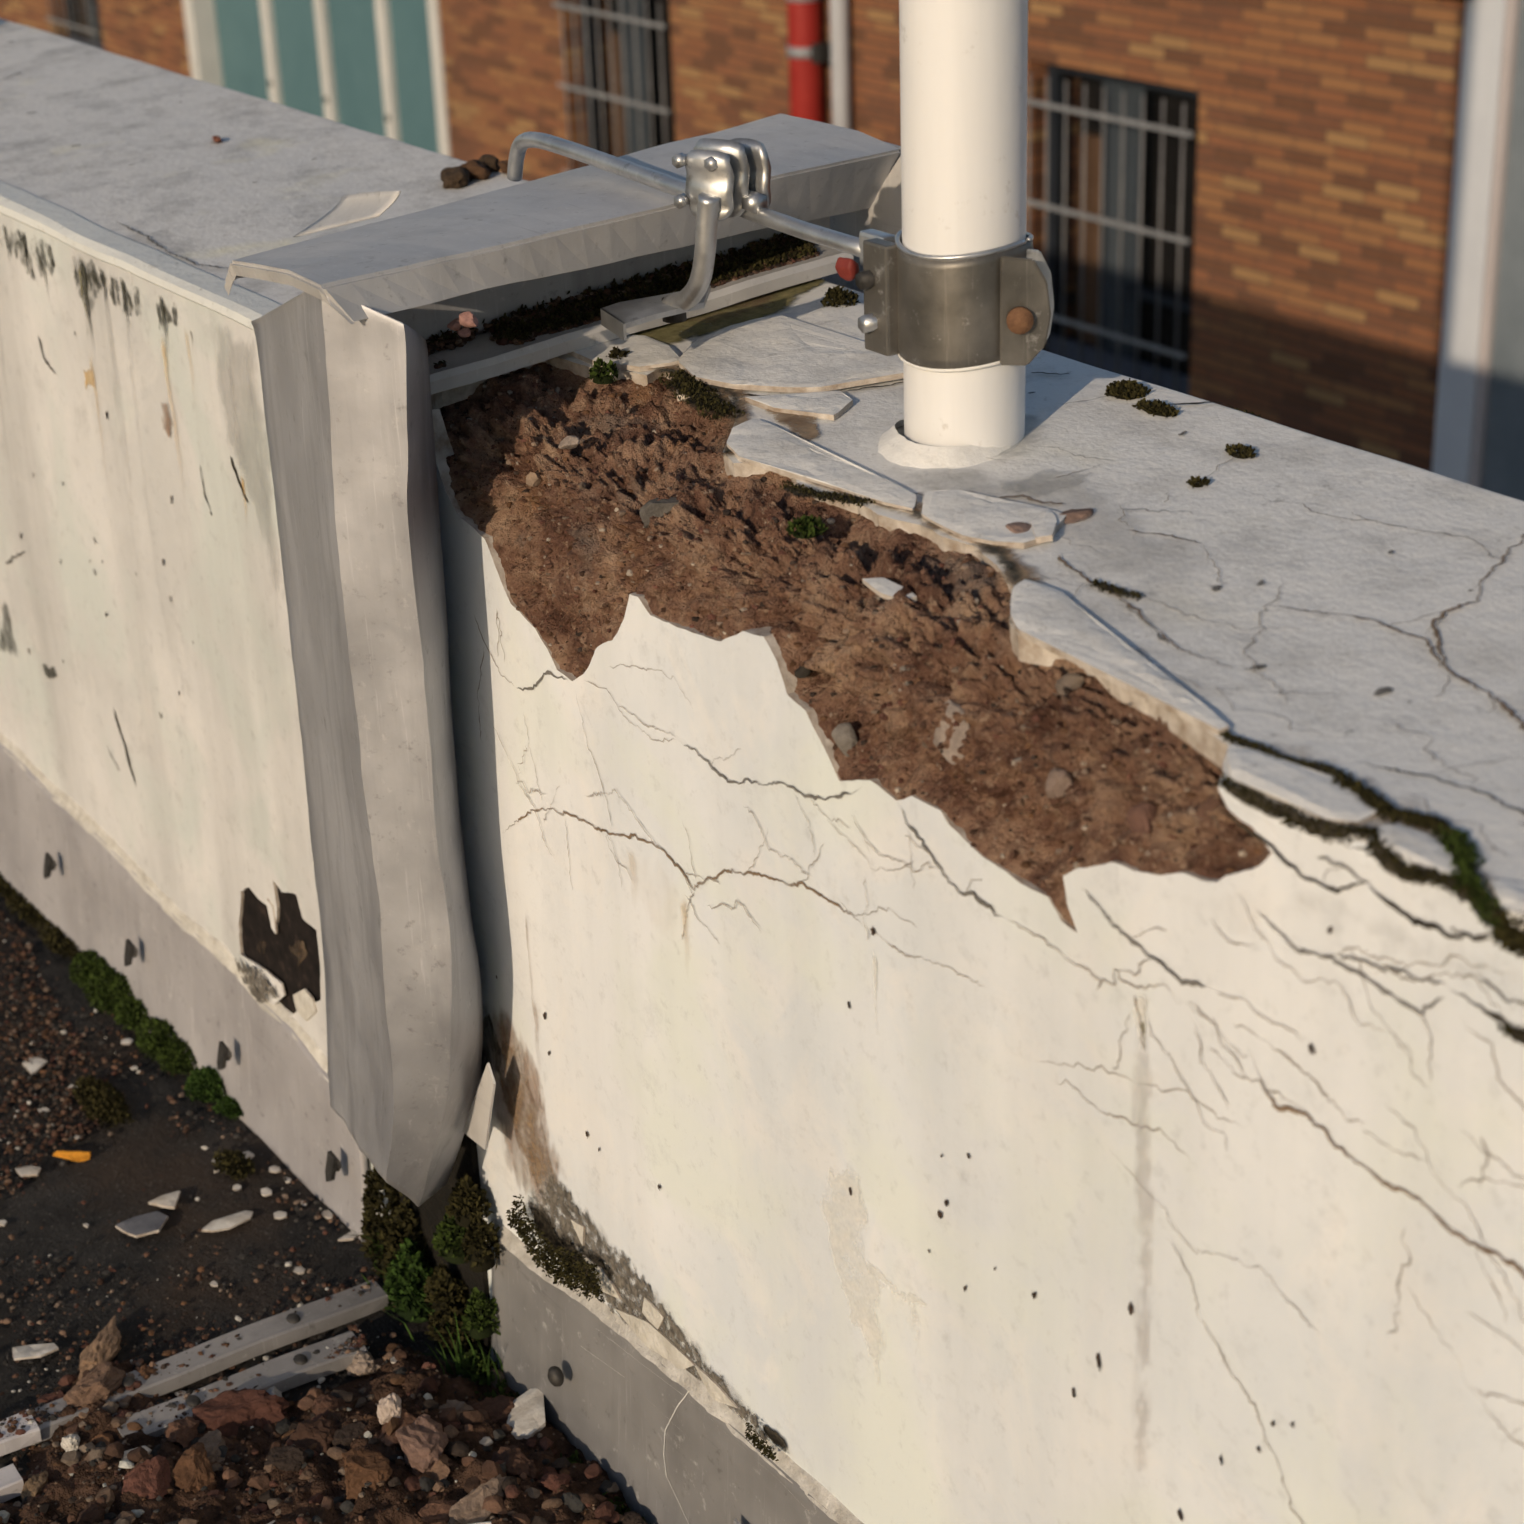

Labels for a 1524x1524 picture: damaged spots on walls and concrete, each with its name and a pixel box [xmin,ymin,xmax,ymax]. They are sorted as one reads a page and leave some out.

damp [3,226,54,283]
damp [74,261,176,333]
spalling [442,303,1459,927]
crack [1043,496,1524,880]
crack [476,612,997,983]
peeling [235,886,321,1021]
crack [1214,811,1524,1108]
spalling [1489,878,1524,930]
crack [1030,891,1524,1351]
crack [1217,1345,1303,1524]
crack [1477,1390,1524,1446]